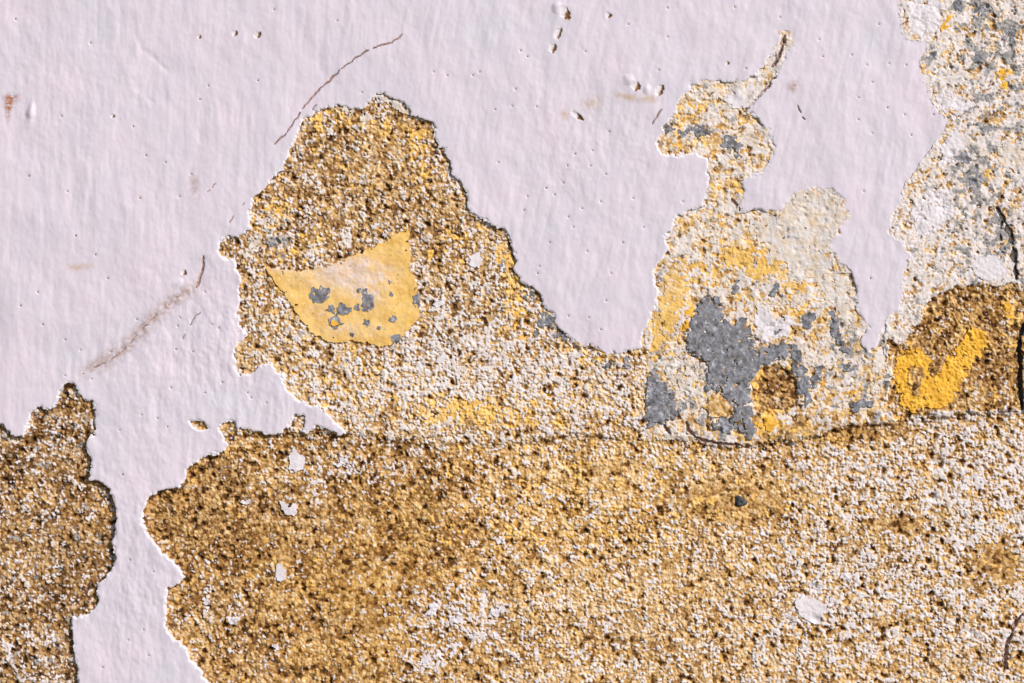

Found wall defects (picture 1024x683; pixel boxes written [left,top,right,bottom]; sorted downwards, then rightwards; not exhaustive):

peeling [219,0,1024,447]
peeling [0,383,117,683]
spalling [142,282,1024,683]